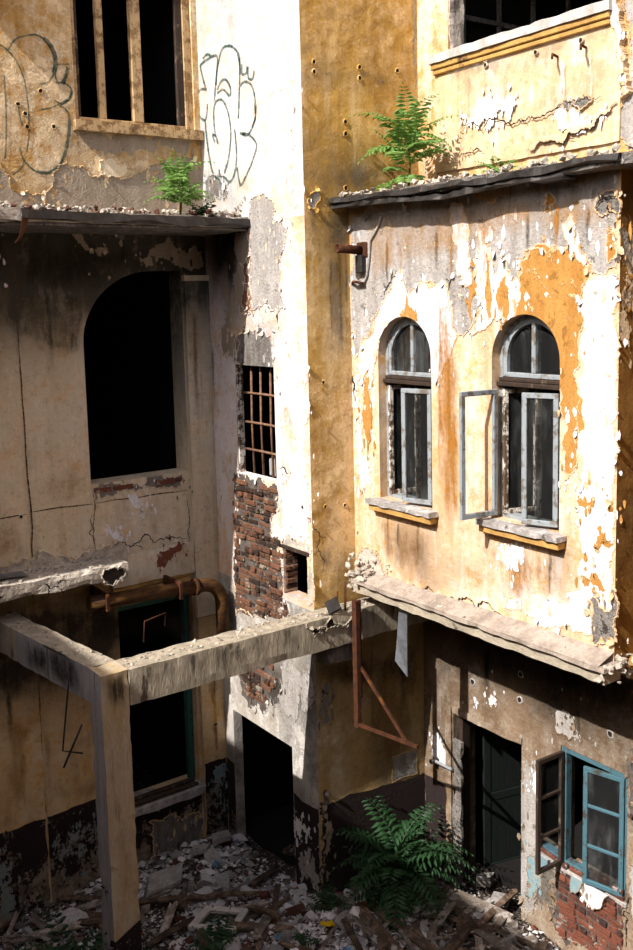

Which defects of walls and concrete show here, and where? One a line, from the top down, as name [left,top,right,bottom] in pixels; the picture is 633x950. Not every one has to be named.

crack [461,96,616,154]
flaking render [604,0,633,151]
flaking render [0,131,312,440]
flaking render [347,170,633,647]
flaking render [0,472,193,586]
crack [89,516,190,550]
flaking render [221,451,322,621]
flaking render [238,659,324,727]
peeling [429,727,445,768]
flaking render [550,708,596,746]
peeling [137,763,503,950]
flaking render [514,746,633,950]